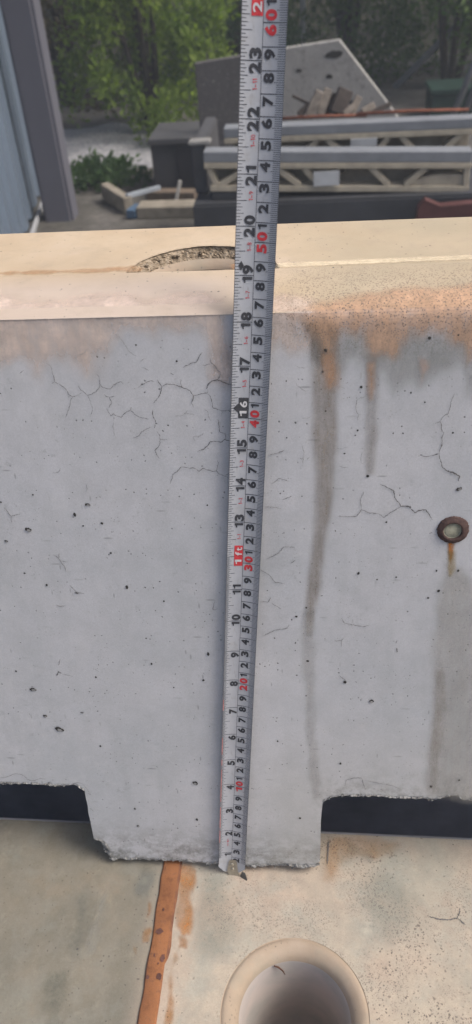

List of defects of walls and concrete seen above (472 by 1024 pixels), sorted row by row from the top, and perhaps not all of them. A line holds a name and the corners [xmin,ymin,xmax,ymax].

spalling [126,245,235,273]
rust [273,288,472,354]
crack [51,336,231,483]
crack [421,396,460,481]
crack [338,484,432,519]